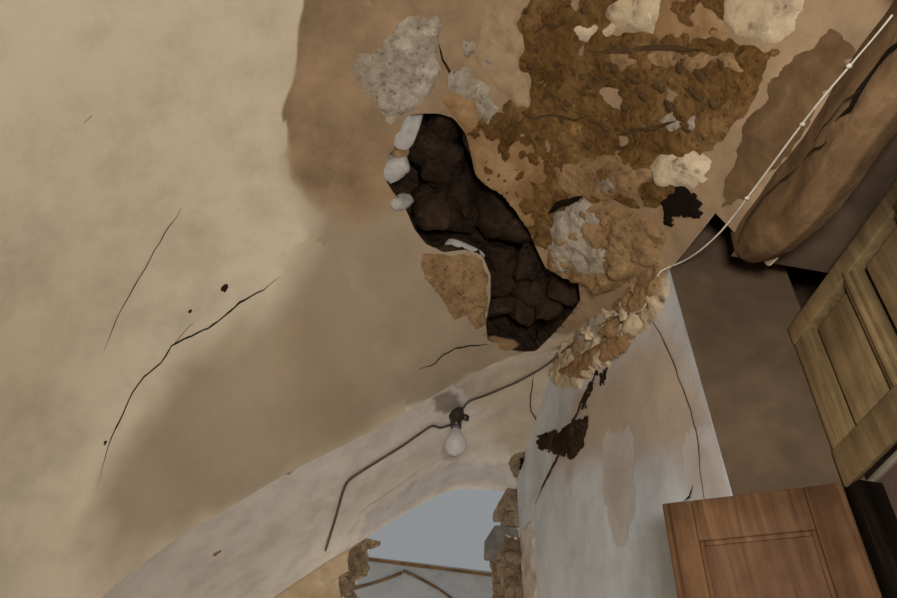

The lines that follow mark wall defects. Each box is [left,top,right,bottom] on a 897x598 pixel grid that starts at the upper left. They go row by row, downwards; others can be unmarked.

flaking render [254,0,894,390]
crack [737,42,897,244]
crack [104,213,179,350]
crack [97,277,280,486]
flaking render [508,451,525,478]
flaking render [536,416,589,460]
flaking render [493,488,538,598]